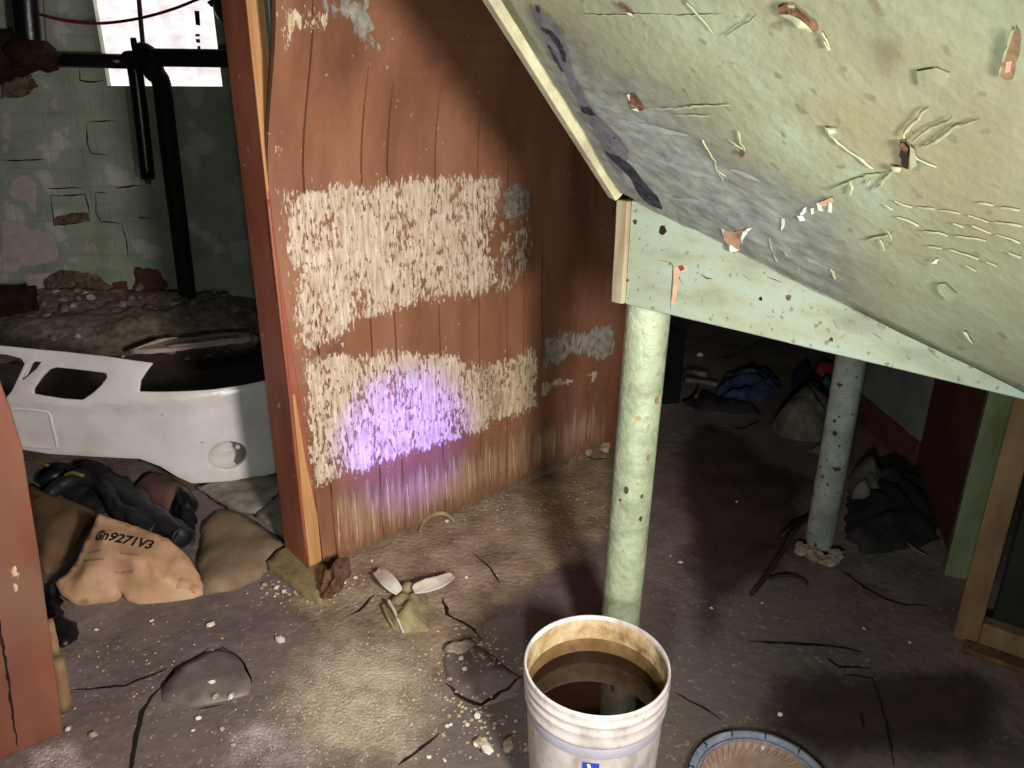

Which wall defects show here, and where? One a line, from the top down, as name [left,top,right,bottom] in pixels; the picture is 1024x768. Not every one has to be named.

spalling [777,4,819,33]
spalling [627,93,645,111]
peeling [1,212,168,291]
leakage [531,6,845,304]
peeling [721,228,752,252]
peeling [781,197,834,231]
crack [827,108,1022,272]
peeling [275,168,615,550]
crack [442,598,483,640]
crack [74,647,252,768]
crack [446,676,522,706]
crack [748,641,895,767]